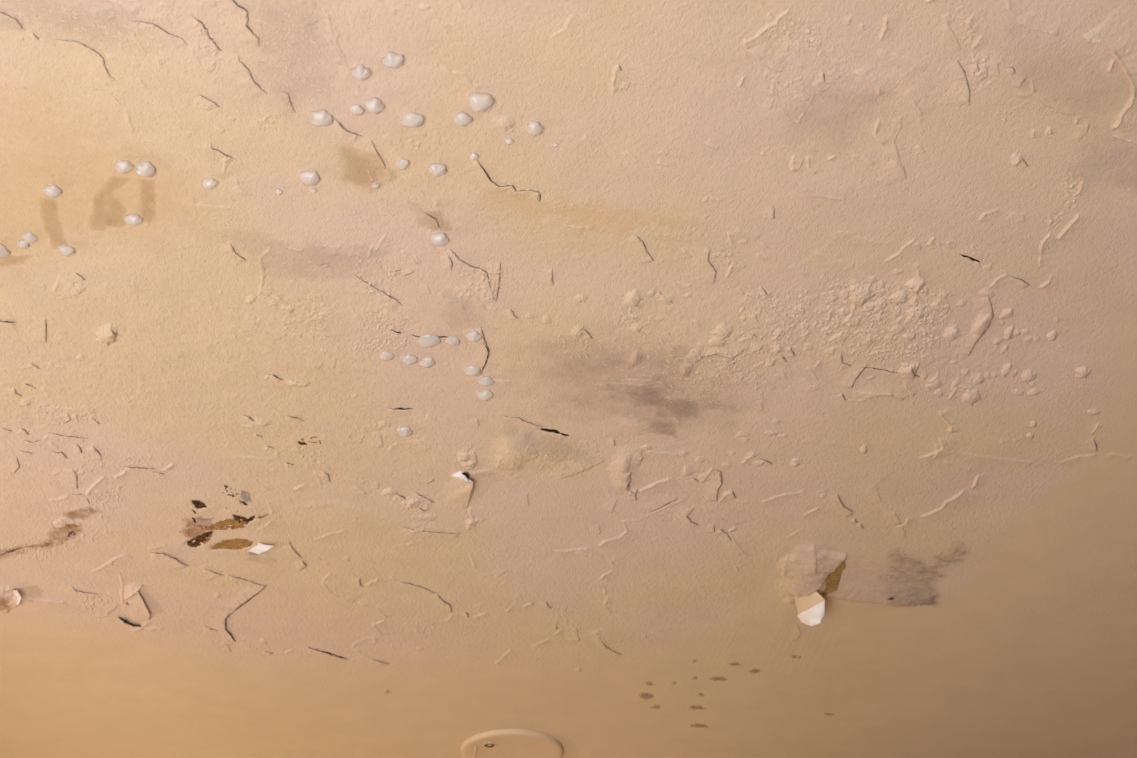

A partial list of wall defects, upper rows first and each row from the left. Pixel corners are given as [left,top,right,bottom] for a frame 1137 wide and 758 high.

peeling [45,441,110,490]
spalling [169,485,329,653]